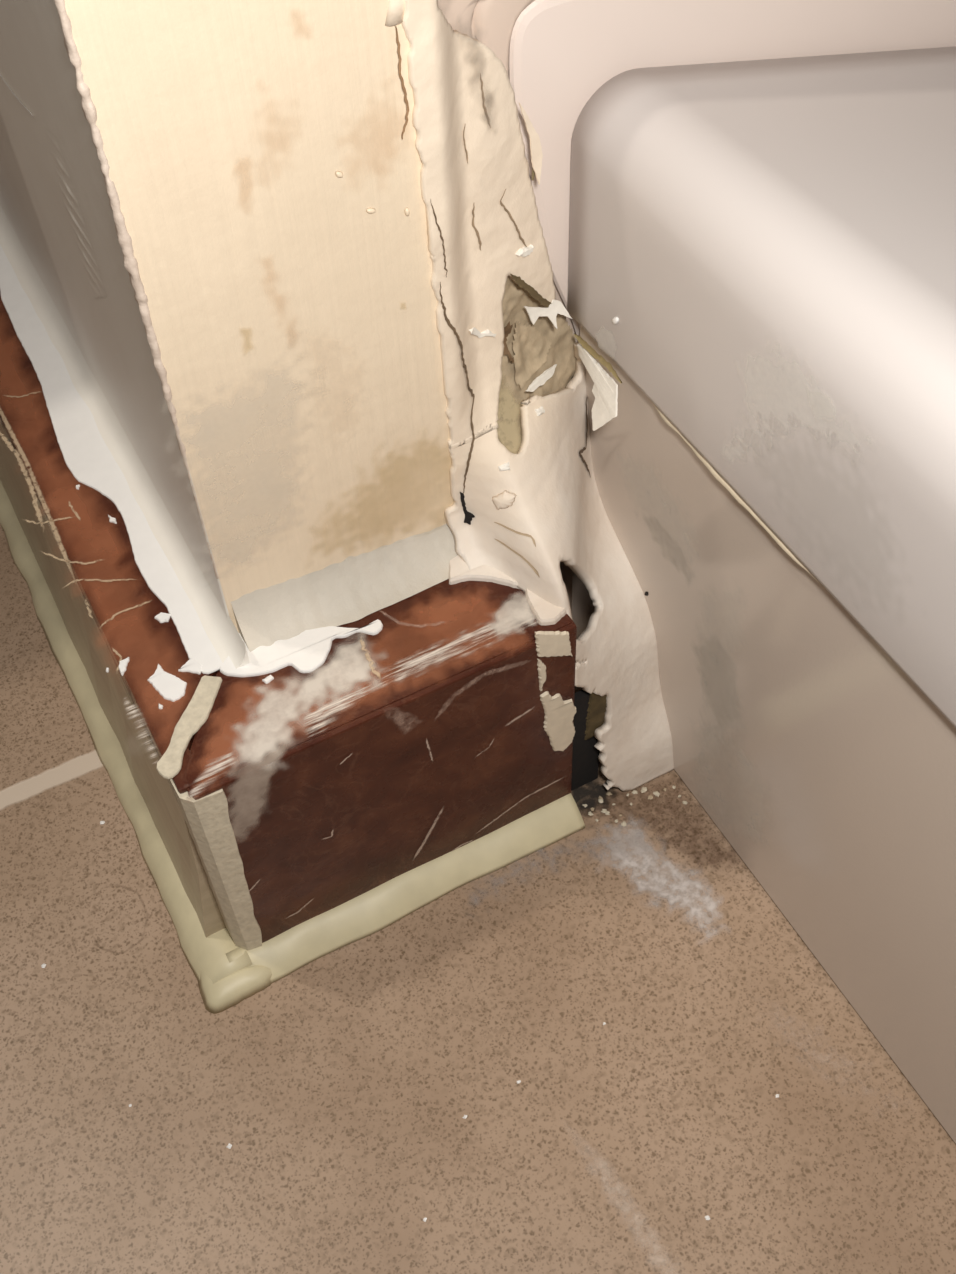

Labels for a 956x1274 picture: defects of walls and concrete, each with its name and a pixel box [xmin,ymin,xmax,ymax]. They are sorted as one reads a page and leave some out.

crack [395,26,409,140]
crack [463,73,491,163]
crack [472,189,527,250]
peeling [515,245,534,257]
crack [511,274,552,307]
crack [431,203,540,577]
peeling [469,277,622,471]
peeling [537,659,576,751]